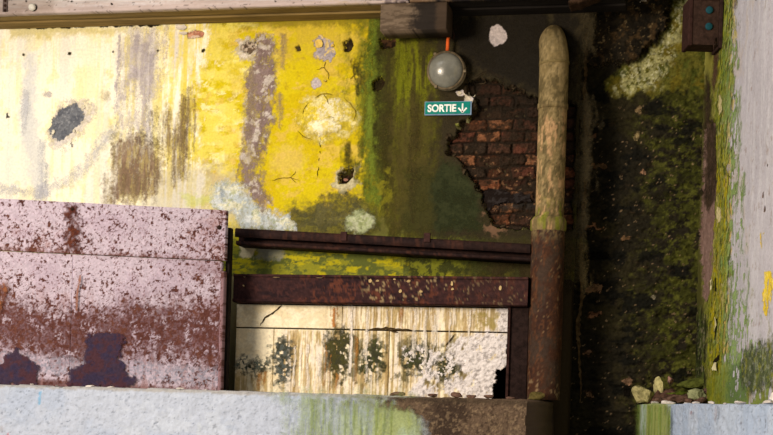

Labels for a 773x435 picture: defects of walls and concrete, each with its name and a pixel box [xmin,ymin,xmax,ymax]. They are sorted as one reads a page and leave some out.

peeling [313,35,353,63]
spalling [48,99,96,148]
damp [72,30,196,204]
damp [211,34,380,235]
spalling [444,77,538,230]
corrosion [62,204,80,251]
peeling [699,0,773,404]
corrosion [0,347,40,385]
corrosion [65,332,138,388]
damp [234,306,386,435]
damp [400,309,461,385]
spalling [378,397,528,435]